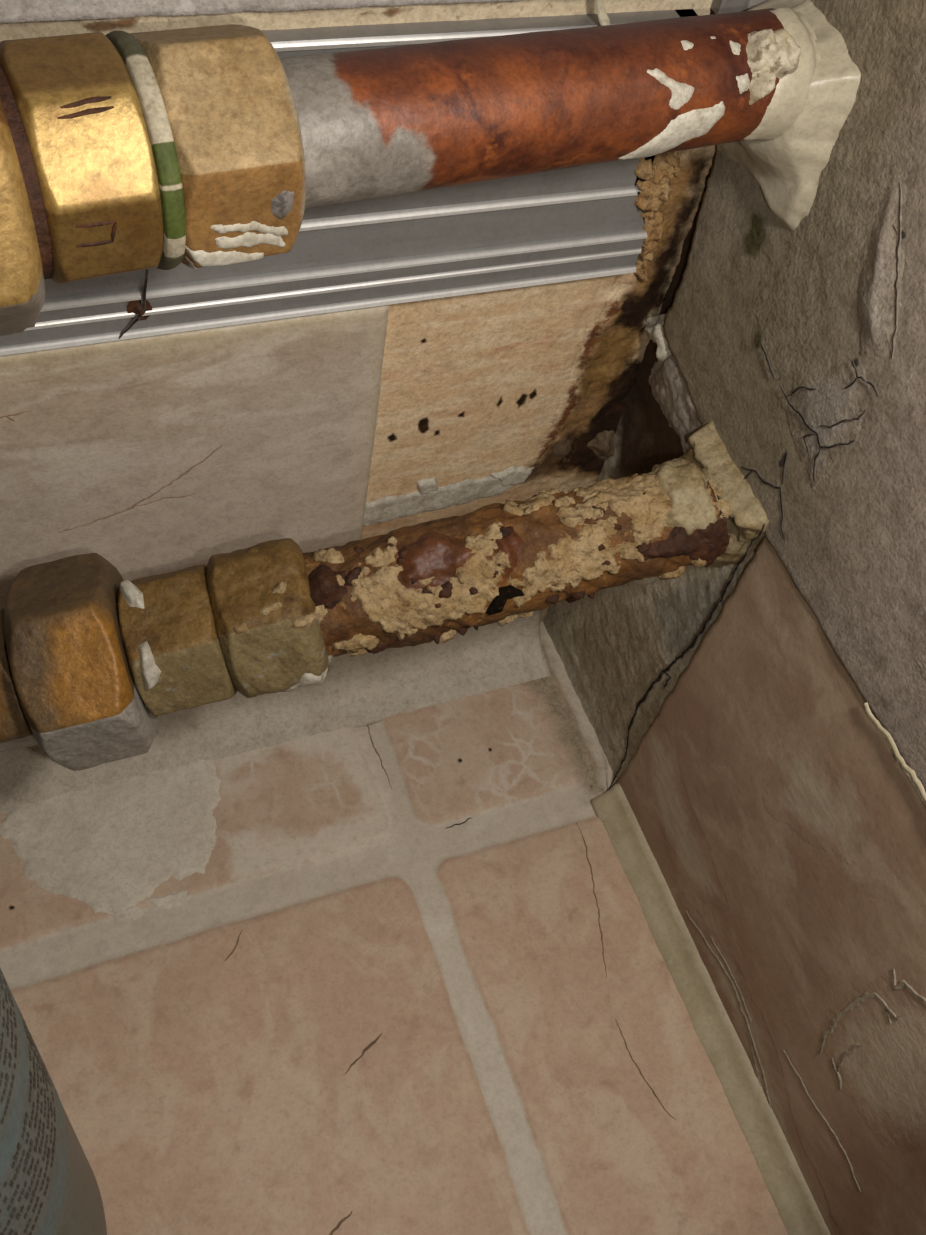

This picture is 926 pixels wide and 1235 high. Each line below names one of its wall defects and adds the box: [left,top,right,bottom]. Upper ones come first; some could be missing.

damp [511,145,717,488]
flaking render [644,314,703,453]
crack [892,182,902,359]
crack [607,342,879,791]
crack [576,822,607,978]
crack [615,1018,676,1120]